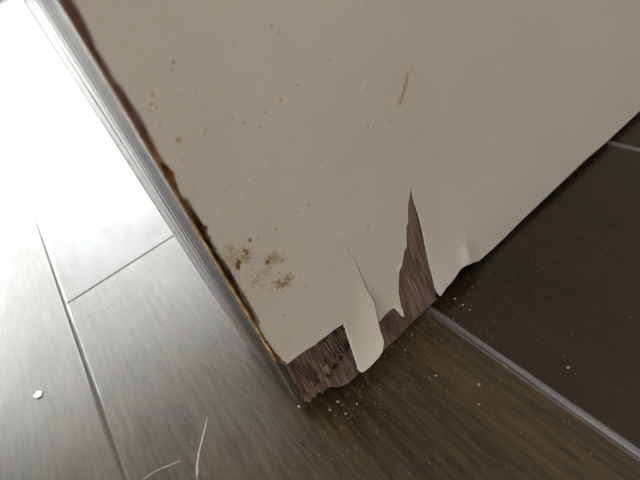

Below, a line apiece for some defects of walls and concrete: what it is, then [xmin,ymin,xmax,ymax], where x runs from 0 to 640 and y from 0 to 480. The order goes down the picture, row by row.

crack [348,250,379,319]
peeling [303,355,359,402]